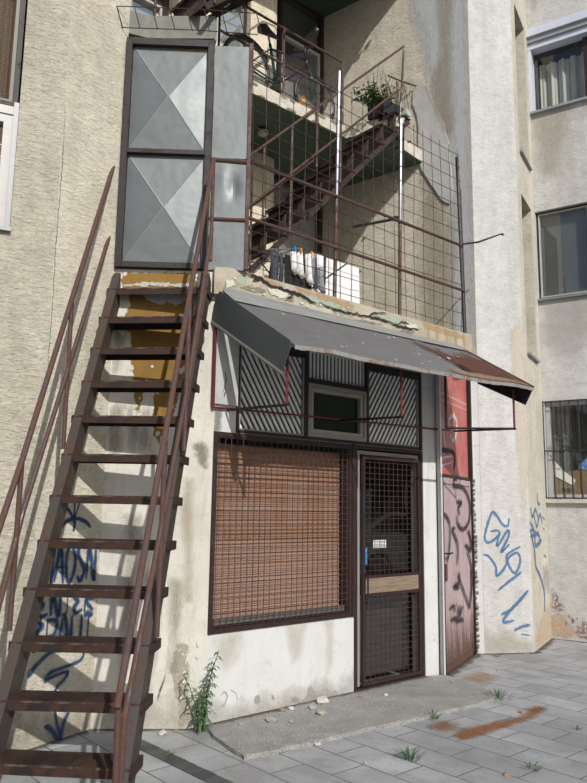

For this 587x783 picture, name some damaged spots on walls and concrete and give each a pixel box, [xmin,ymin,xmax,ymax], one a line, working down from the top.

peeling [121,271,201,316]
peeling [226,275,421,333]
peeling [118,330,192,347]
peeling [129,360,185,381]
corrosion [412,324,528,385]
peeling [132,392,179,416]
peeling [551,590,587,639]
corrosion [436,707,543,739]